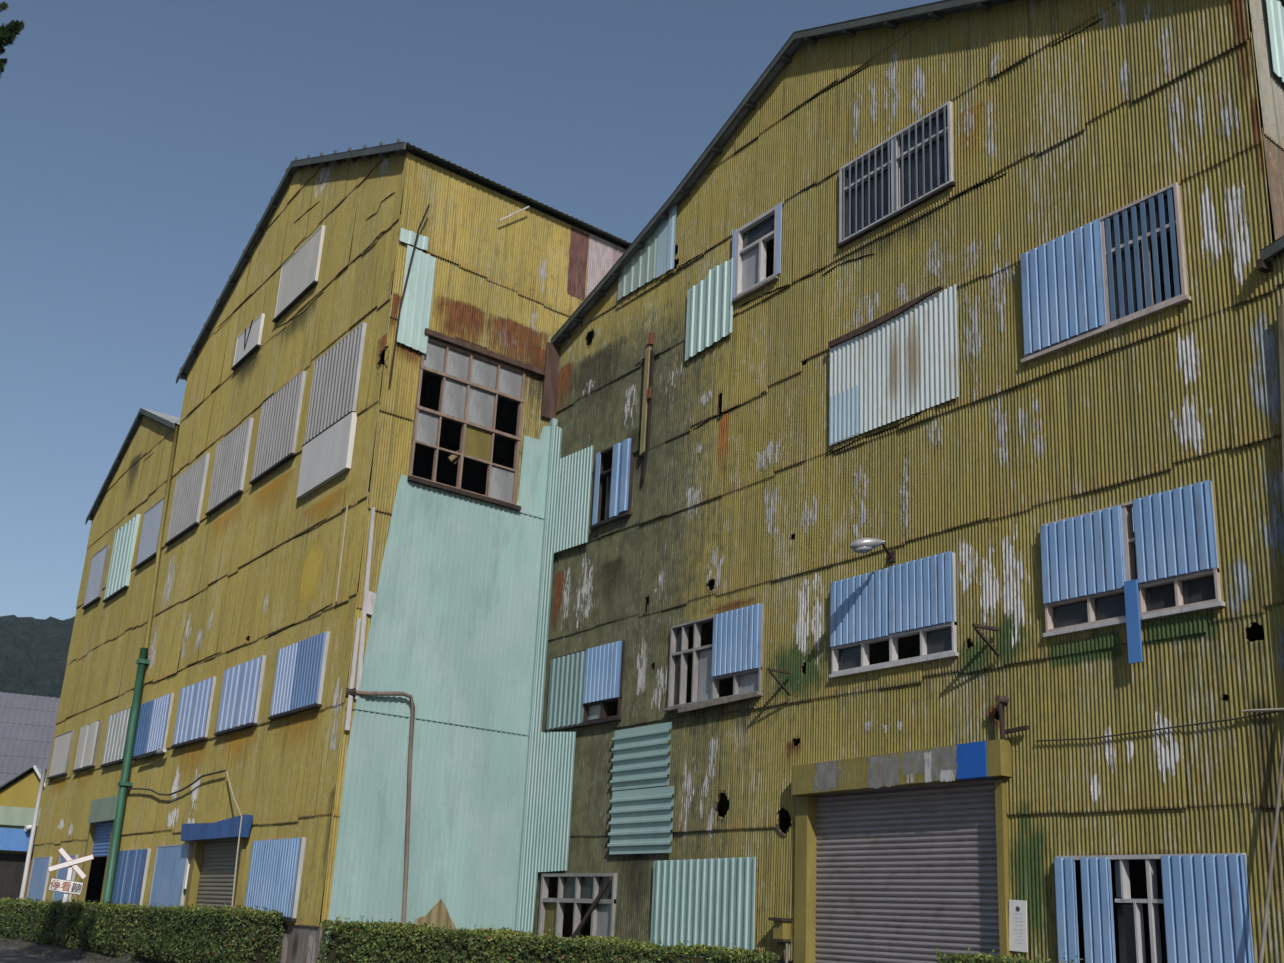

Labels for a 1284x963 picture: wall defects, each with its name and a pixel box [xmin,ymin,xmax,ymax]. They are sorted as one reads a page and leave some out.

rust [1252,98,1264,166]
peeling [1200,173,1253,285]
rust [439,298,571,409]
peeling [1167,331,1212,457]
peeling [559,552,593,652]
peeling [796,558,822,666]
peeling [958,517,1031,648]
peeling [678,726,721,844]
peeling [1089,725,1135,810]
peeling [1150,706,1184,782]